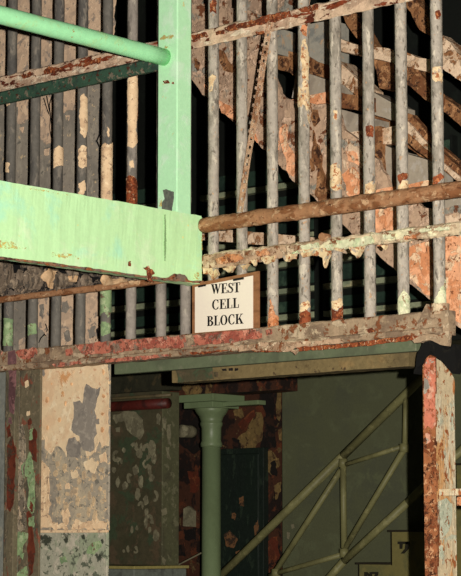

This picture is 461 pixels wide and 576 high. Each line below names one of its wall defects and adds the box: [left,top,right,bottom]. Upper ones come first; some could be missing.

rust [216,11,292,35]
peeling [63,89,88,138]
peeling [101,143,113,200]
rust [126,175,138,204]
peeling [203,206,397,280]
peeling [409,213,461,323]
peeling [0,260,343,356]
rust [268,299,279,328]
rust [299,300,311,324]
rust [331,298,343,321]
peeling [0,297,159,560]
rust [6,424,16,512]